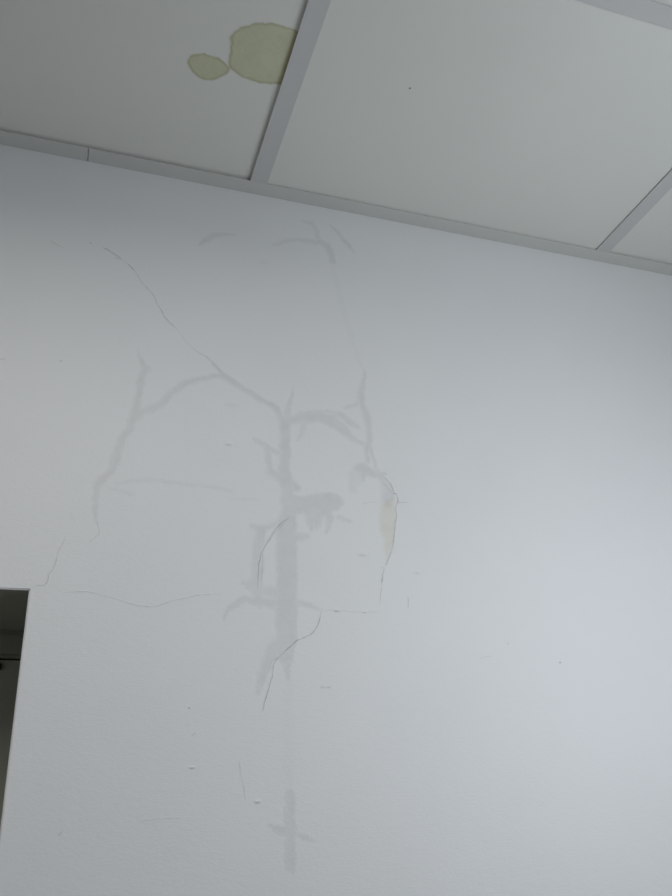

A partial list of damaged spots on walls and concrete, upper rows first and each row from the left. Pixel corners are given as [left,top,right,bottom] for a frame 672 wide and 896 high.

leakage [185,20,299,88]
leakage [90,348,394,876]
crack [256,516,290,591]
crack [262,476,408,713]